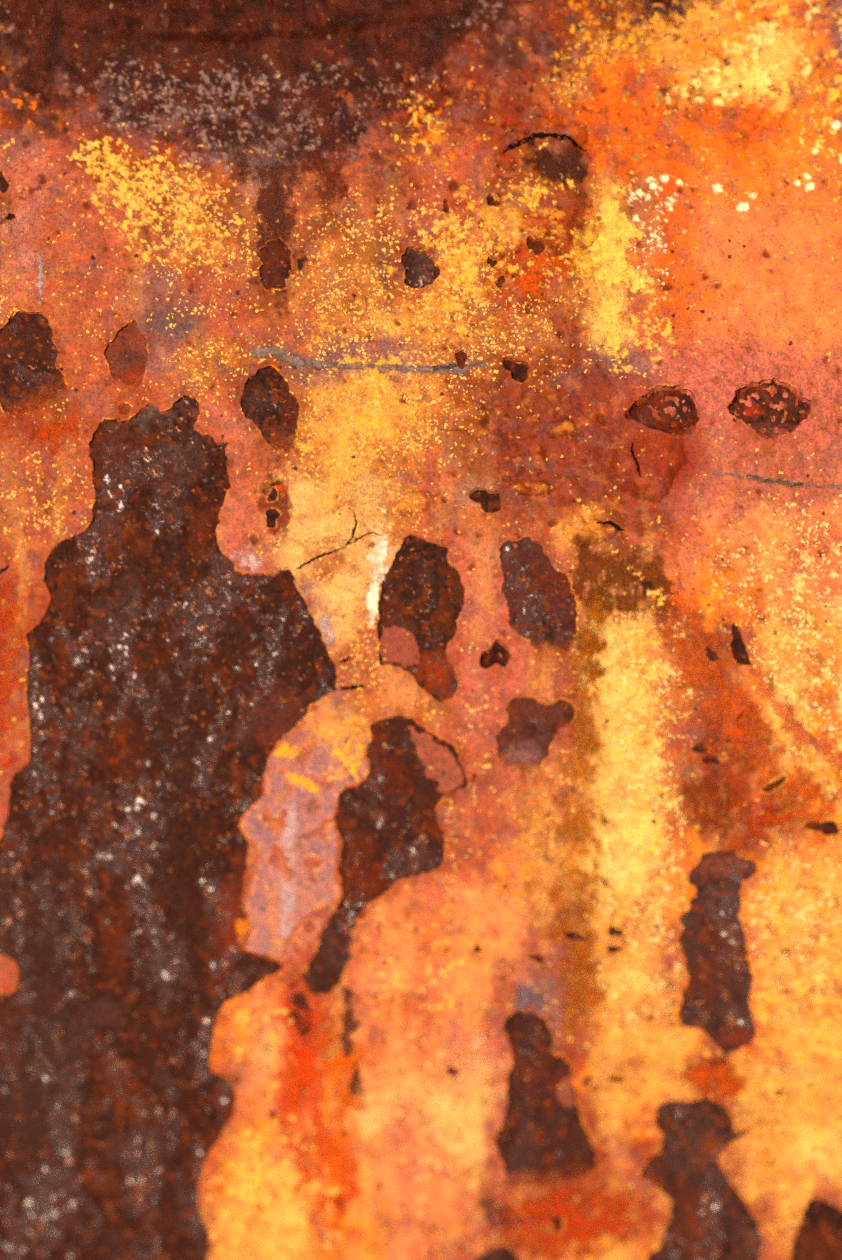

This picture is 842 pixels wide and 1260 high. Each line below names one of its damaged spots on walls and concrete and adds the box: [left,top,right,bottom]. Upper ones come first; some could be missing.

rust [580,0,696,35]
rust [0,0,500,269]
rust [522,140,601,243]
rust [258,474,292,536]
peeling [474,531,584,675]
rust [569,535,842,837]
peeling [0,306,474,1260]
peeling [672,845,762,1060]
rust [279,985,365,1216]
peeling [490,1006,602,1193]
peeling [636,1092,770,1260]
peeling [786,1192,842,1260]